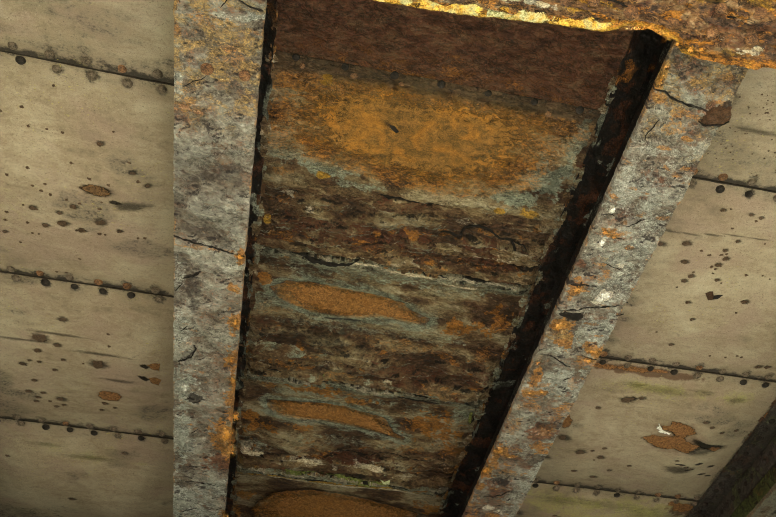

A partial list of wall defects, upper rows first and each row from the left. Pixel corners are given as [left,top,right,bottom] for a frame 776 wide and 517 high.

rust [265,11,279,68]
rust [376,0,706,35]
rust [700,8,776,45]
rust [598,76,617,114]
spalling [698,96,748,134]
peeling [26,177,147,236]
rust [220,82,598,517]
rust [584,350,668,373]
spalling [25,379,67,408]
peeling [98,391,122,411]
peeling [559,415,572,440]
peeling [643,421,723,473]